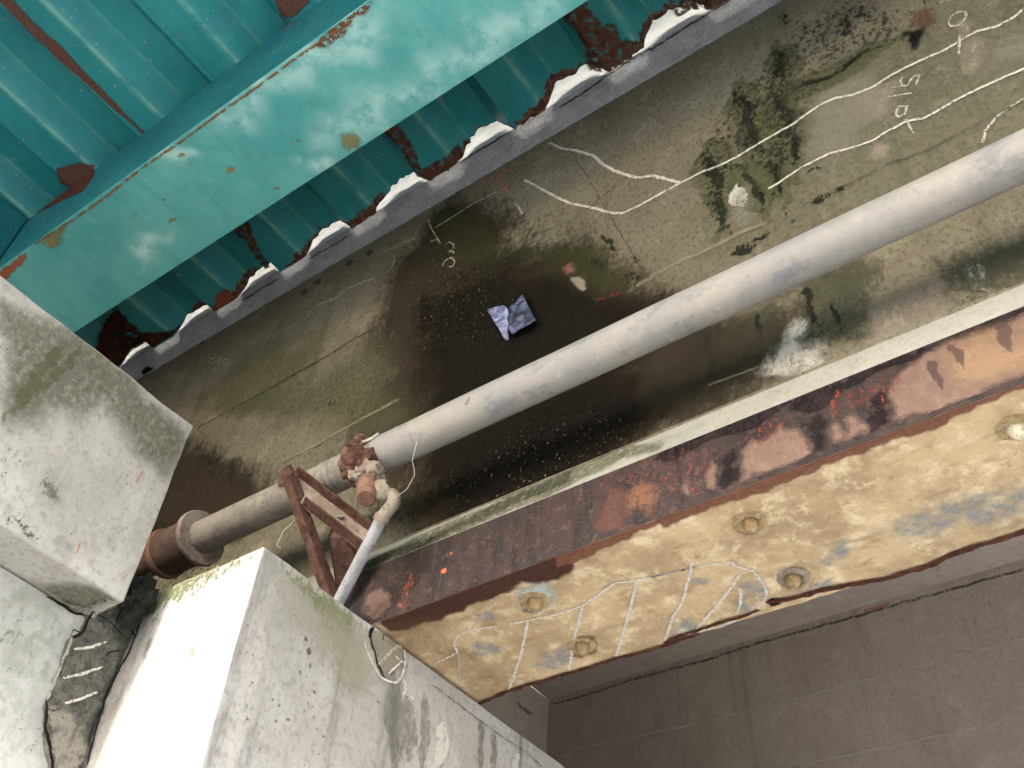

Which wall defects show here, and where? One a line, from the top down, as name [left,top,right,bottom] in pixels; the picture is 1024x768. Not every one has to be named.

corrosion [0,0,144,134]
corrosion [34,0,372,247]
corrosion [562,2,638,72]
corrosion [673,0,728,17]
water stain [690,1,910,256]
corrosion [96,307,180,366]
water stain [351,192,674,437]
water stain [151,436,273,533]
water stain [386,315,819,536]
corrosion [381,376,1024,631]
crack [44,596,143,768]
crack [368,627,385,678]